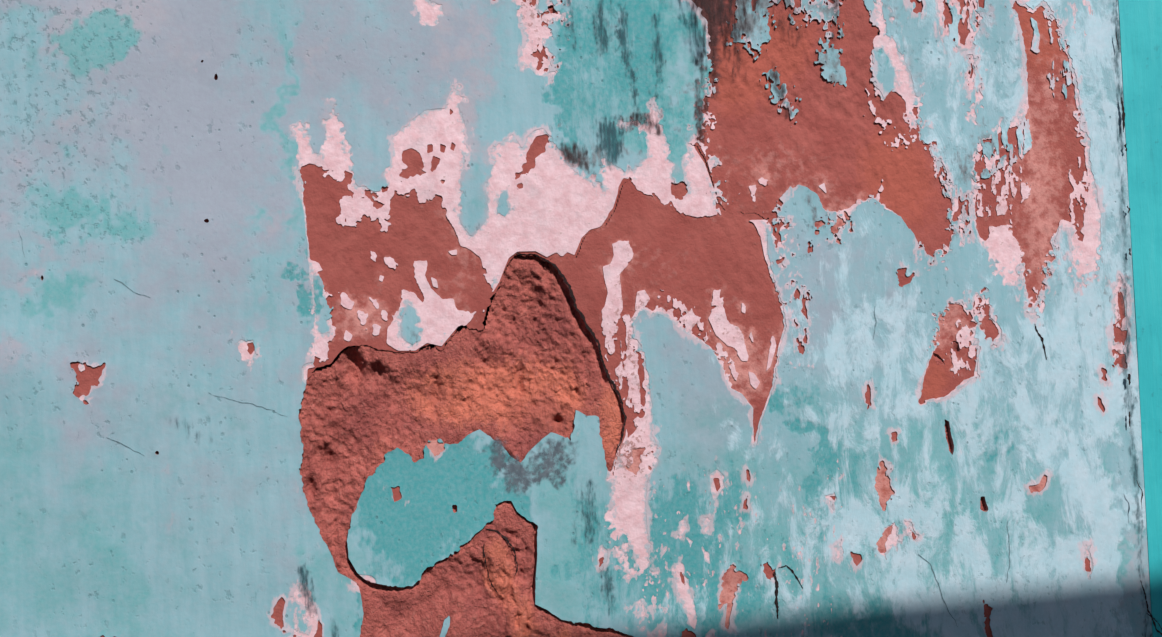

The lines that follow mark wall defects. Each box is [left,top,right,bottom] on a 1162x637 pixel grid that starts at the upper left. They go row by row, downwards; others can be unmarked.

peeling [291,0,1103,637]
peeling [71,361,106,405]
peeling [271,583,322,637]